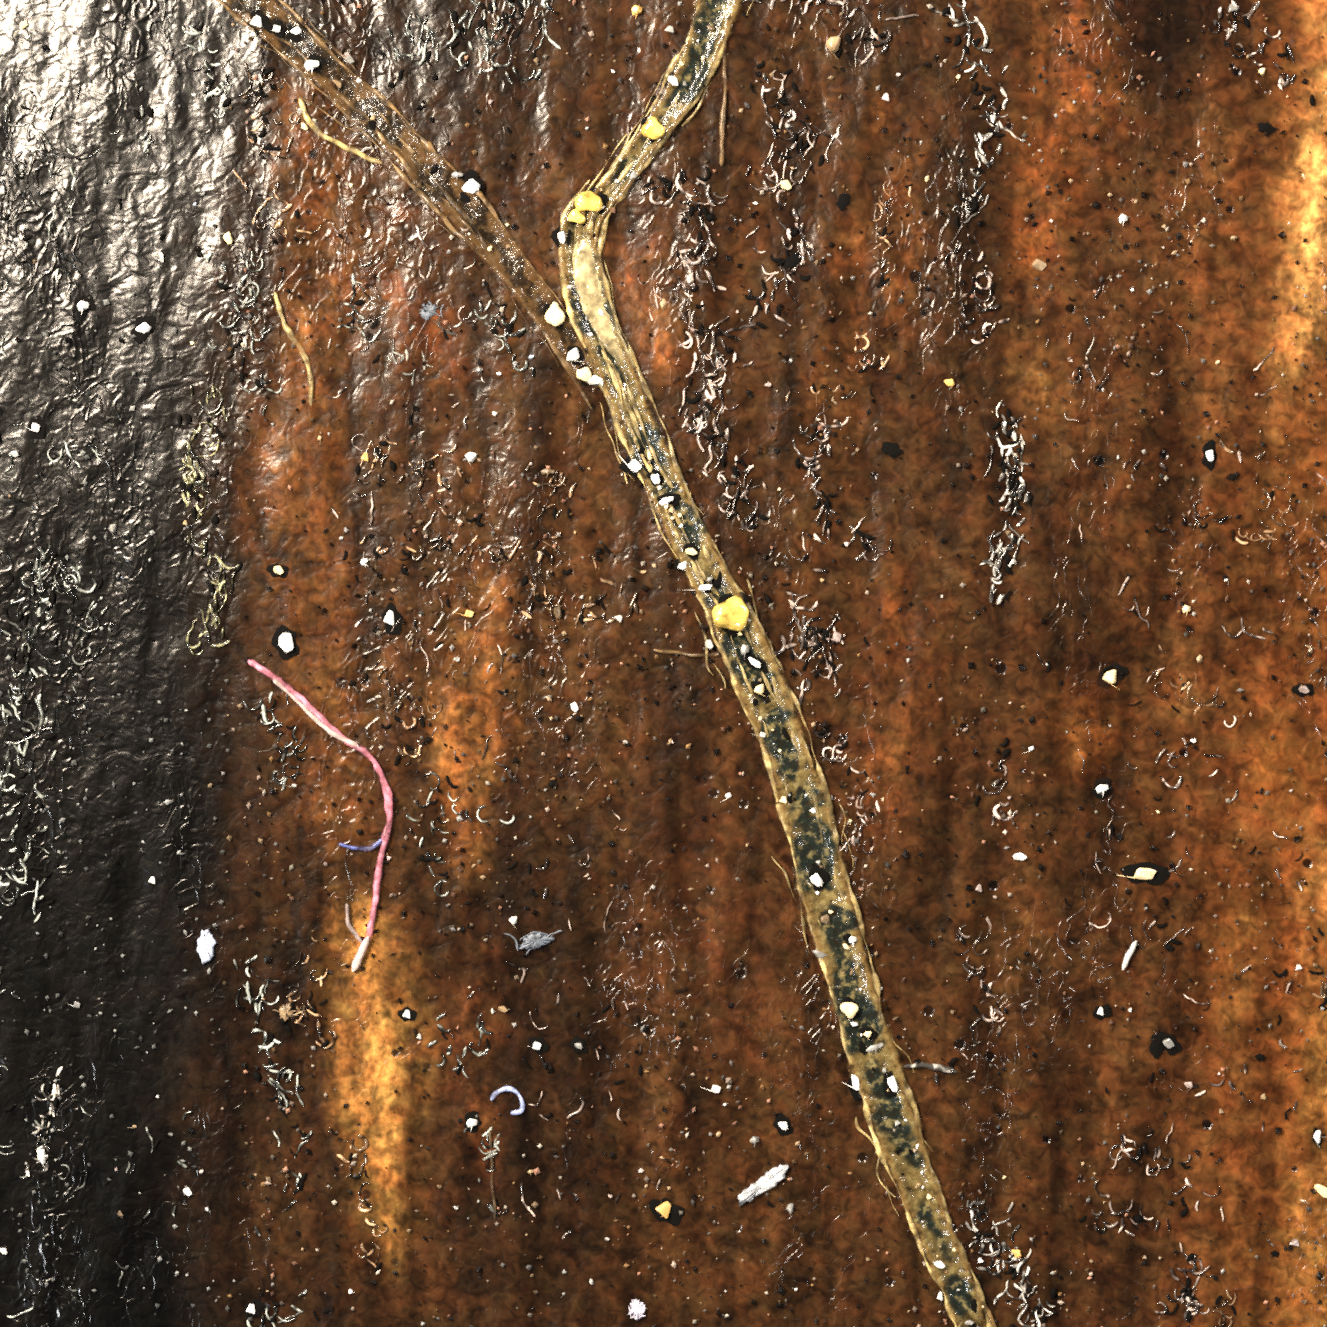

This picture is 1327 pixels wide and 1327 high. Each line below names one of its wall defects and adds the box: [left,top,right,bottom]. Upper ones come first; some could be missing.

crack [216,0,996,1327]